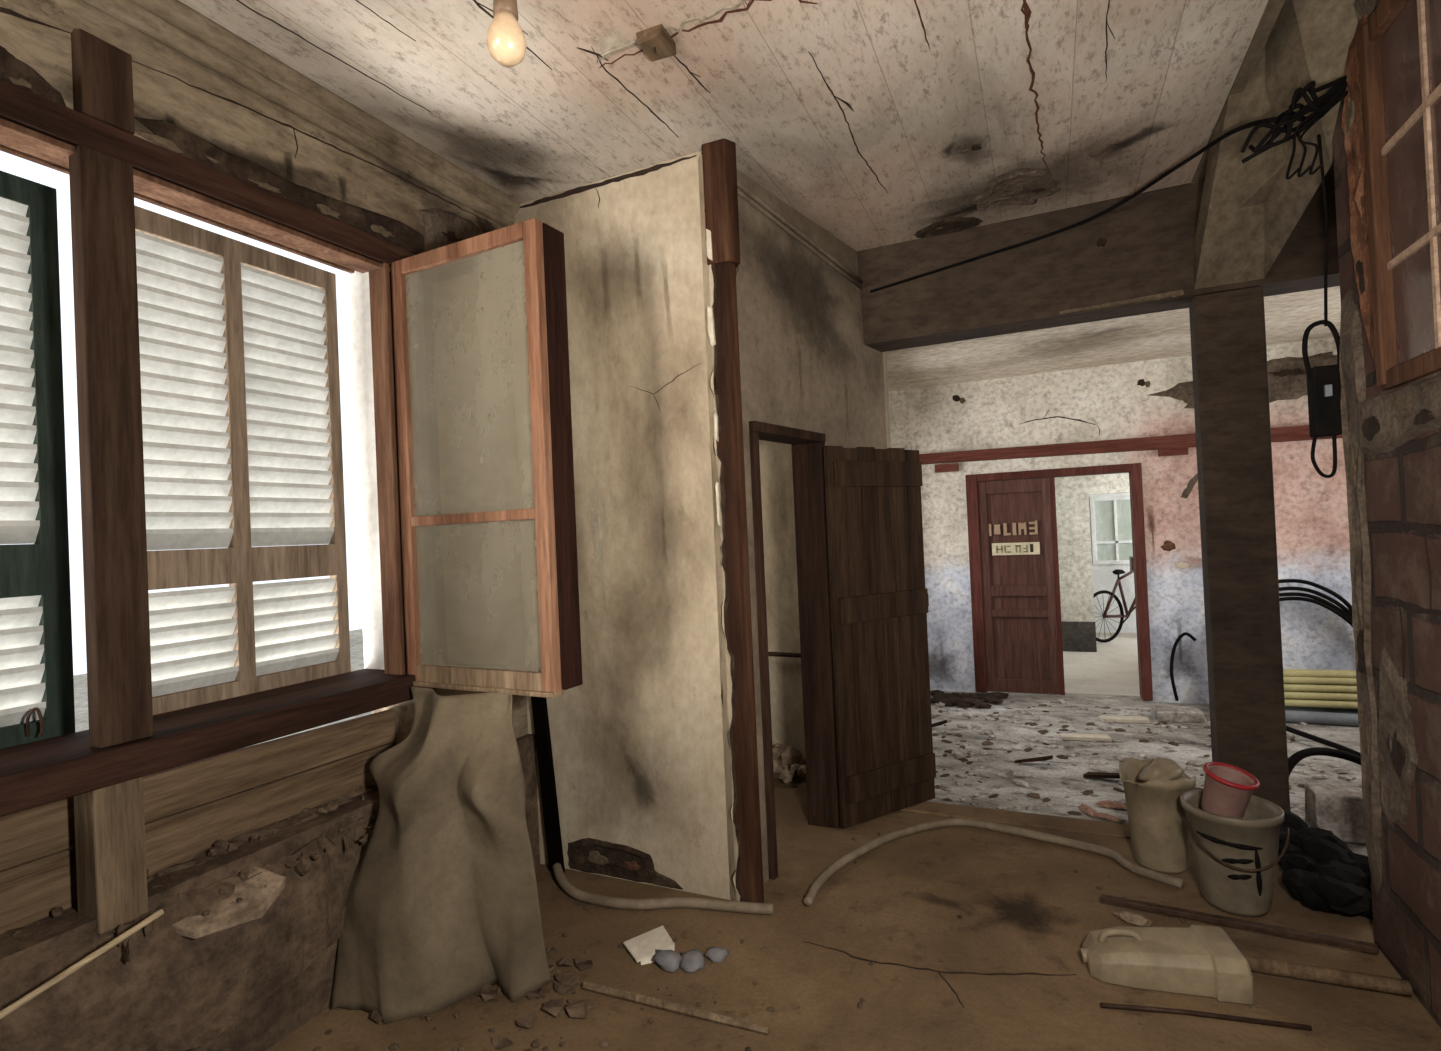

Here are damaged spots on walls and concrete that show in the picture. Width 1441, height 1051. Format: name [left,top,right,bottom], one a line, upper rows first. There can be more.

spalling [0,46,67,107]
crack [132,0,817,224]
crack [808,51,888,193]
crack [914,0,930,50]
crack [1021,0,1048,169]
crack [1105,0,1115,79]
damp [1115,129,1157,149]
crack [805,942,1077,1009]